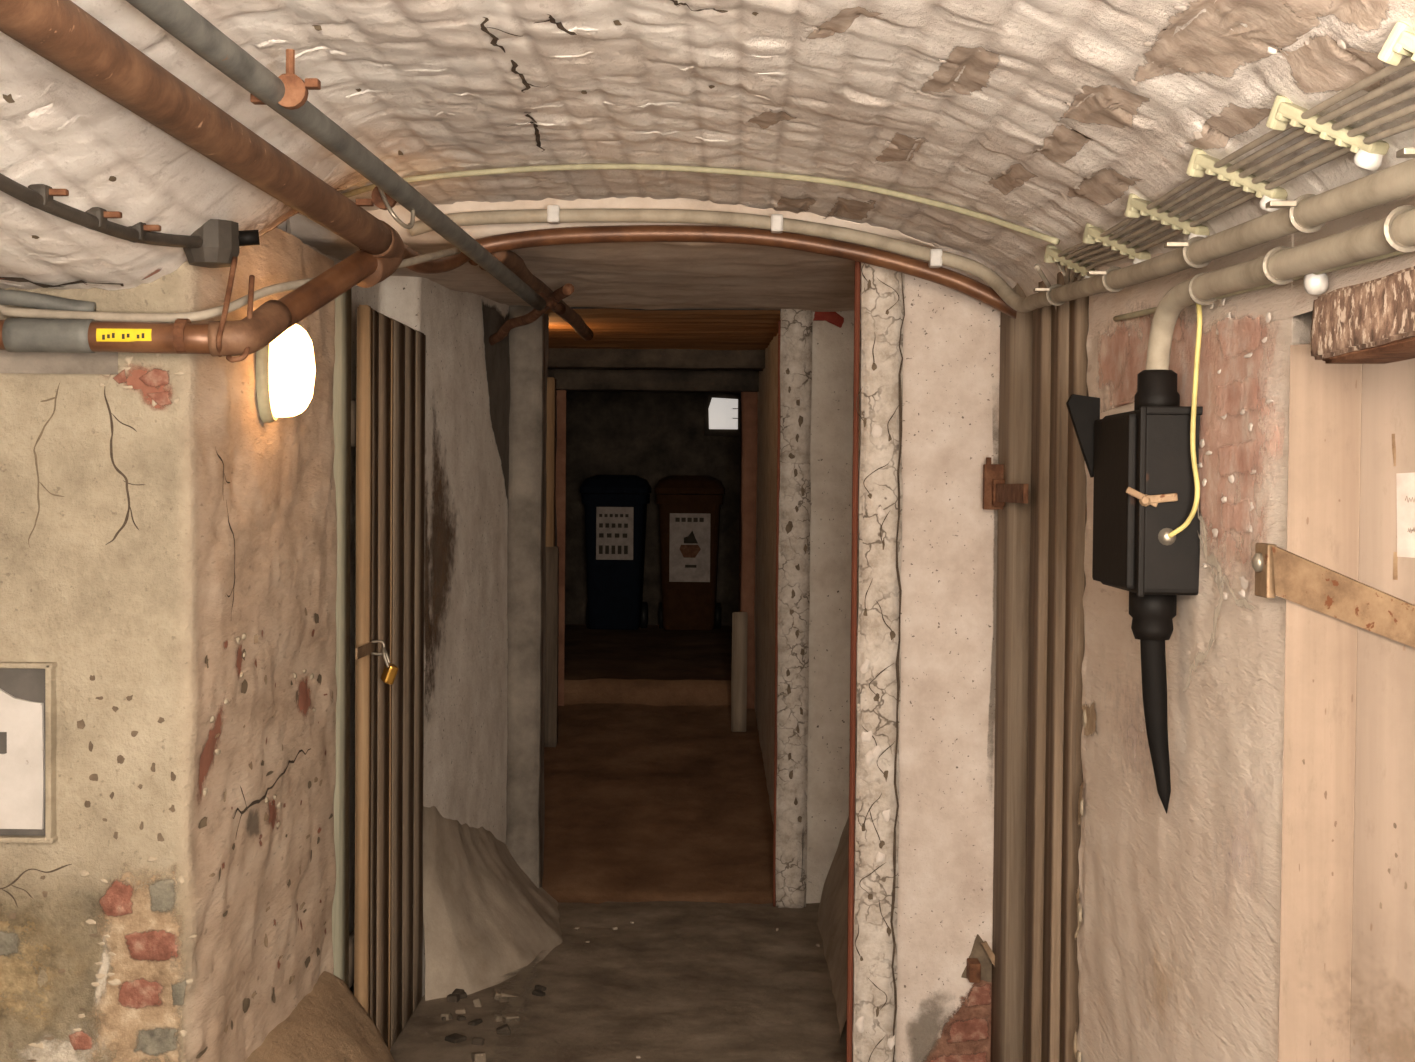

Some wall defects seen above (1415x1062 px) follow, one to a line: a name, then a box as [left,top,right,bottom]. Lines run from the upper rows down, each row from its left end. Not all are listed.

crack [480,14,577,152]
peeling [916,46,1000,95]
peeling [982,0,1389,195]
peeling [773,197,875,220]
crack [28,383,64,547]
crack [104,388,145,545]
peeling [1169,298,1279,600]
water stain [424,435,455,694]
peeling [855,263,905,1062]
crack [233,749,310,836]
spalling [0,821,208,1062]
spalling [924,934,992,1062]